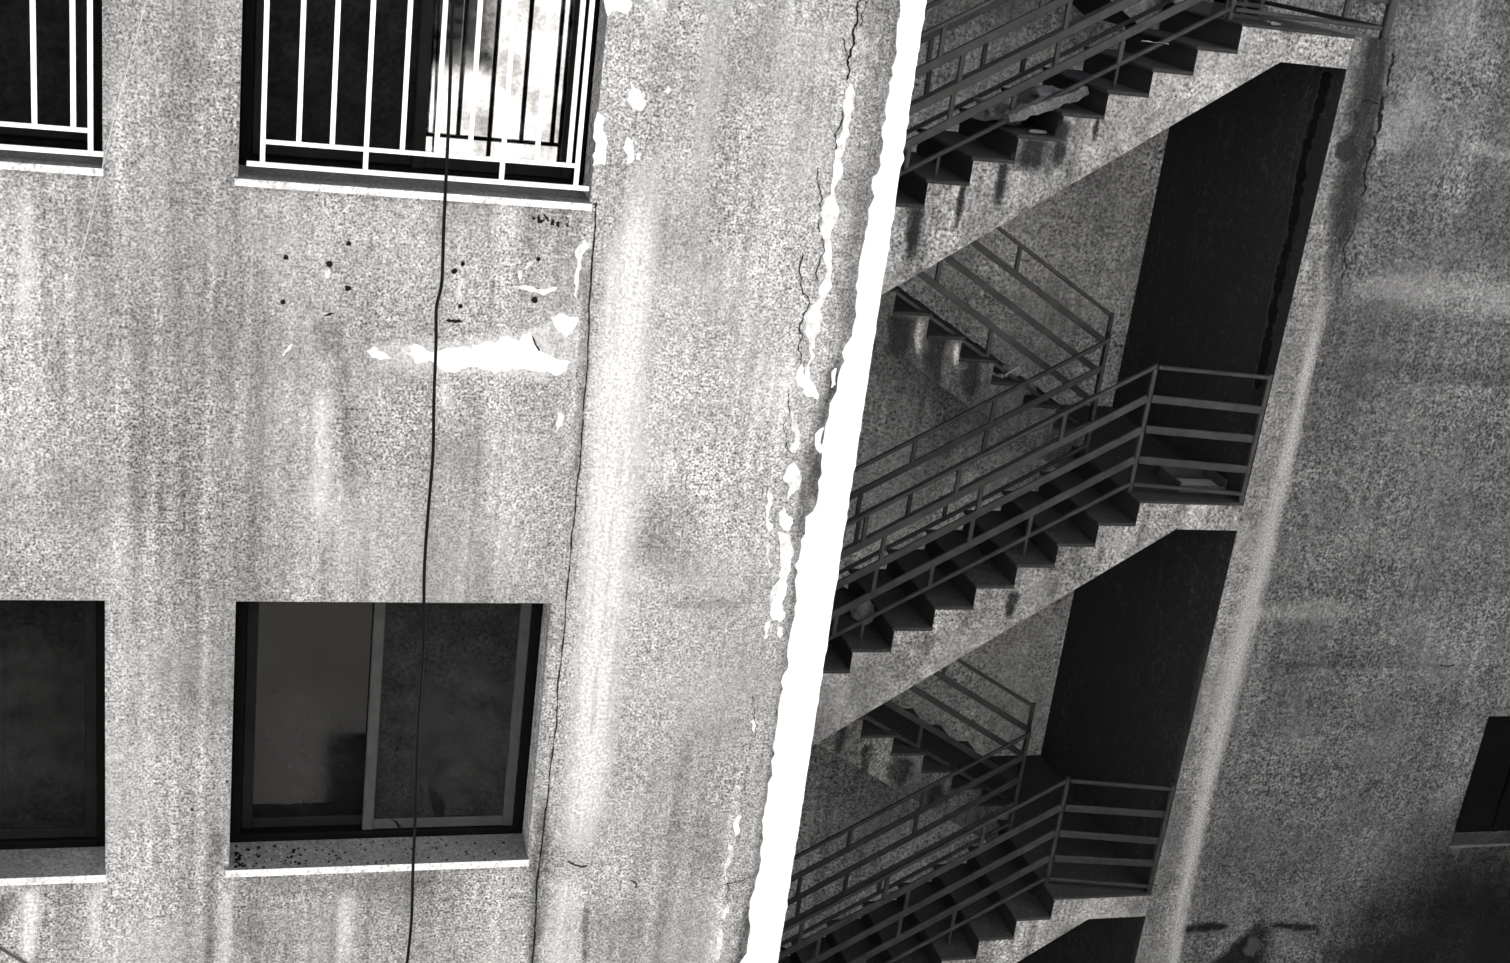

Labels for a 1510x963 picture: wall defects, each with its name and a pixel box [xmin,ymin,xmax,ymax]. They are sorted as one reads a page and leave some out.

crack [783,0,866,453]
peeling [796,82,855,400]
crack [531,202,597,963]
peeling [764,410,824,639]
water stain [23,892,38,959]
peeling [723,816,742,882]